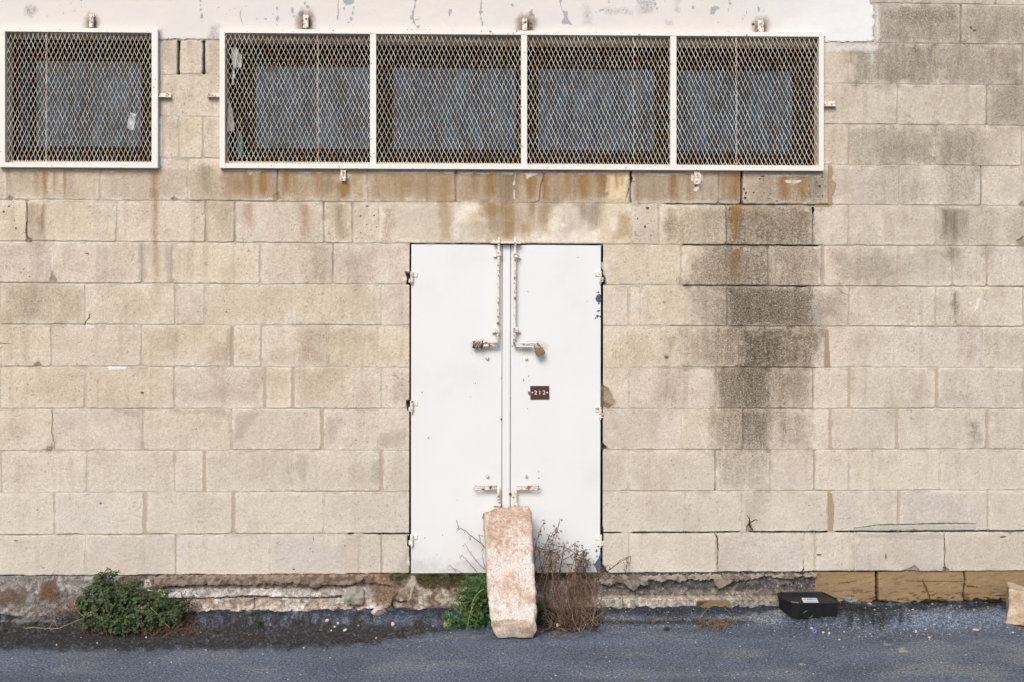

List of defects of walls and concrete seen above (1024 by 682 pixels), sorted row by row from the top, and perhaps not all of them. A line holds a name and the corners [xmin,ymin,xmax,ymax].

damp [721,290,821,405]
peeling [144,569,364,591]
spalling [696,600,731,608]